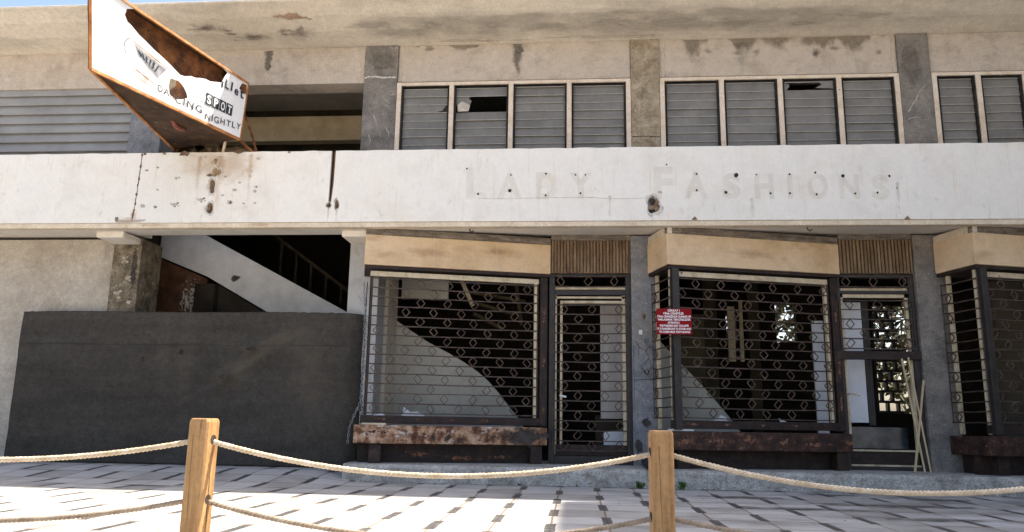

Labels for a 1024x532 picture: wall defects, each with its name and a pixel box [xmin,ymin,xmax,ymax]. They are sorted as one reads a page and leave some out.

leakage [513,44,523,70]
leakage [588,12,710,53]
leakage [710,9,870,62]
crack [131,153,143,221]
spalling [195,157,260,216]
crack [325,152,340,210]
spalling [646,191,664,217]
peeling [113,254,132,304]
corrosion [444,406,549,461]